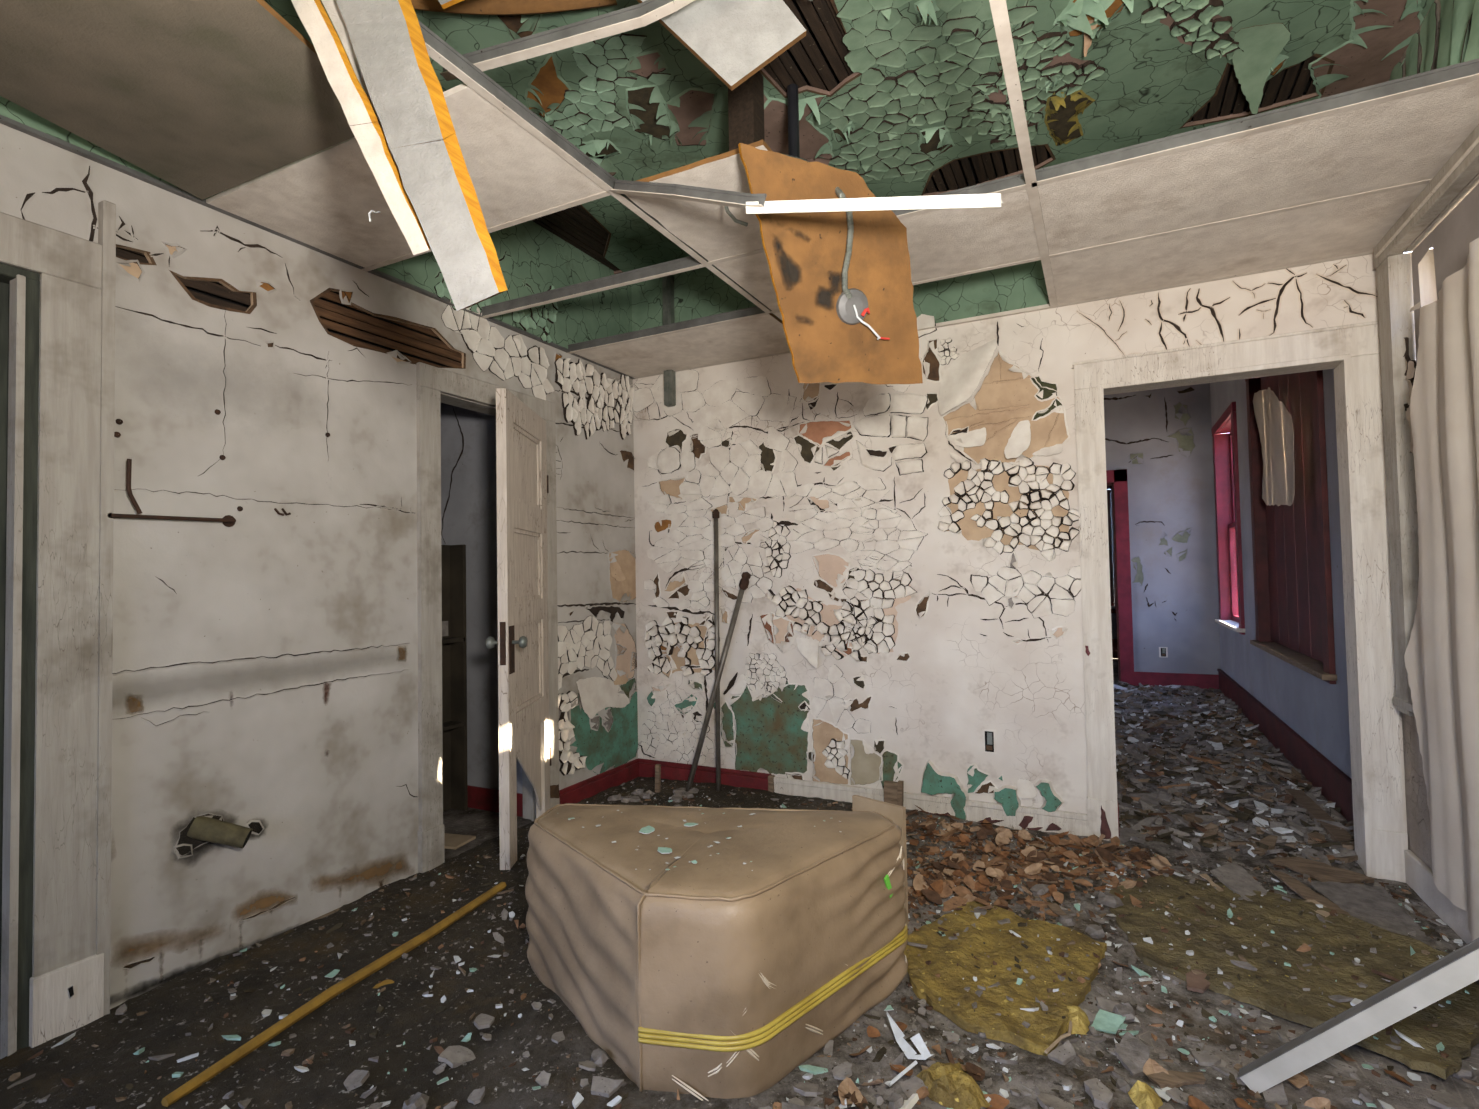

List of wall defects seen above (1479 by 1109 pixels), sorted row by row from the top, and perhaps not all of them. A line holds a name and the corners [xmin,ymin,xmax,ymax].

peeling [524,33,717,176]
flaking render [759,0,1479,196]
crack [17,164,172,267]
crack [200,224,301,302]
flaking render [532,205,623,274]
crack [995,321,1074,372]
crack [1076,263,1378,356]
crack [114,304,465,544]
peeling [310,282,1081,799]
flaking render [171,811,226,860]
peeling [918,760,1064,831]